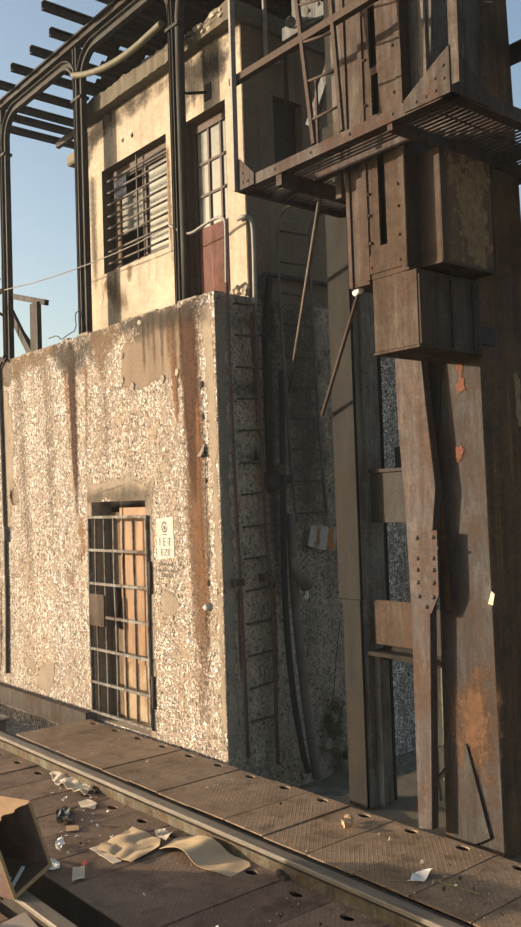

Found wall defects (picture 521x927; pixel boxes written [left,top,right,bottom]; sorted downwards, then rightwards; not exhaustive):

leakage [104,272,124,309]
leakage [91,326,121,371]
rust [455,361,465,392]
rust [64,343,87,502]
rust [454,443,464,463]
rust [169,303,209,698]
rust [451,669,492,780]